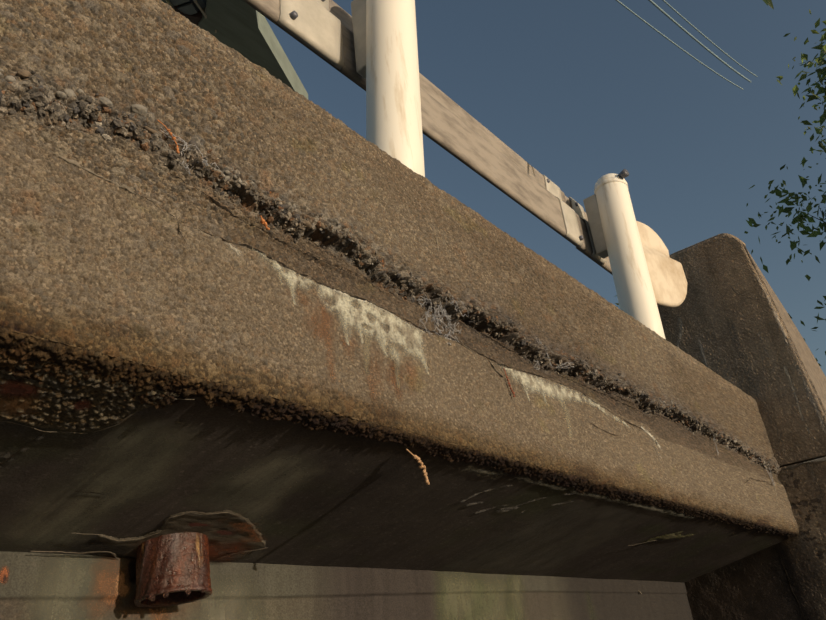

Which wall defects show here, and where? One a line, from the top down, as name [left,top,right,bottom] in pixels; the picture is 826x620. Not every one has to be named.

crack [40,146,642,436]
water stain [256,251,429,374]
water stain [503,367,605,437]
corrosion [98,561,136,604]